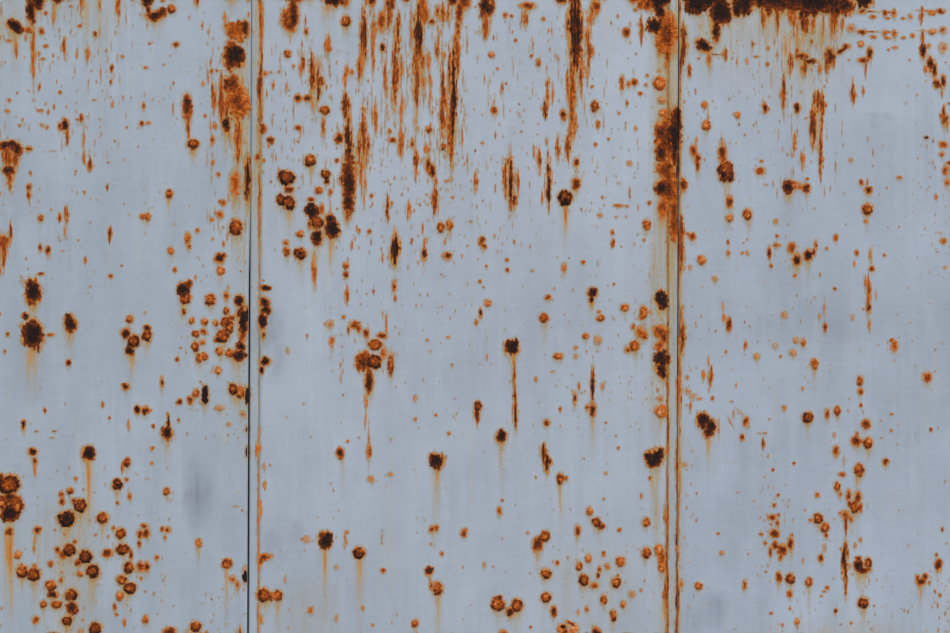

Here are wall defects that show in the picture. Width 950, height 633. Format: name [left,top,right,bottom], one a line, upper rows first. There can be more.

corrosion [0,0,124,205]
corrosion [172,0,537,460]
corrosion [120,312,153,367]
corrosion [127,404,155,431]
corrosion [166,381,204,421]
corrosion [121,457,132,500]
corrosion [490,594,524,618]